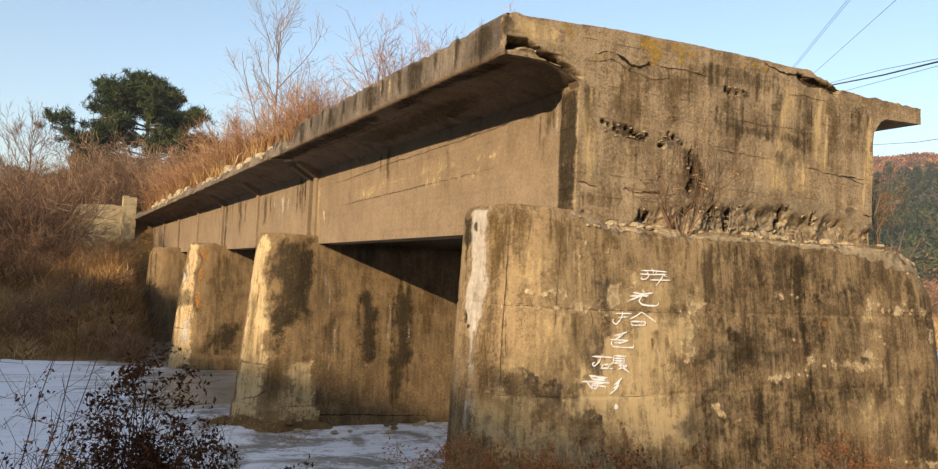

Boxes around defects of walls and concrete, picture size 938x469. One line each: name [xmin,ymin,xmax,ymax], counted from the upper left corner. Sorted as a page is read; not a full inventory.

crack [585,51,707,96]
damp [660,63,762,99]
crack [764,62,845,102]
spalling [600,118,705,192]
damp [756,77,837,195]
damp [854,110,873,213]
spalling [577,197,922,282]
damp [168,234,320,421]
damp [357,290,380,370]
damp [386,279,436,404]
damp [764,256,835,468]
damp [828,309,917,440]